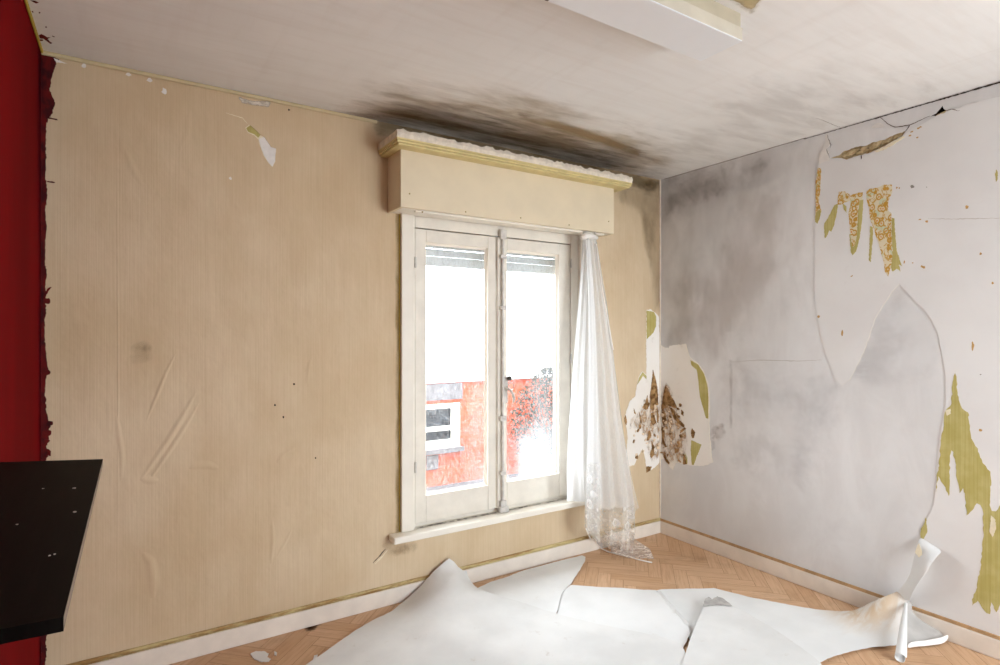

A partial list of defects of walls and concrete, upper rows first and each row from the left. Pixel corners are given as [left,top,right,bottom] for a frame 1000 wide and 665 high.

peeling [246,126,276,166]
flaking render [832,126,922,160]
peeling [625,309,713,470]